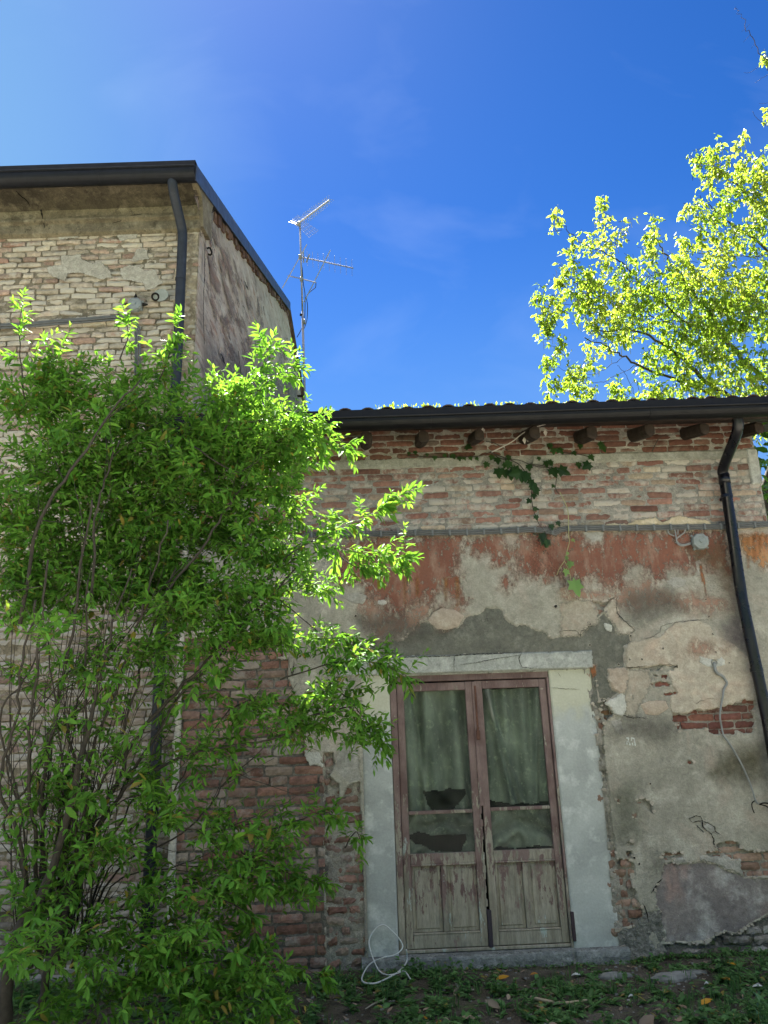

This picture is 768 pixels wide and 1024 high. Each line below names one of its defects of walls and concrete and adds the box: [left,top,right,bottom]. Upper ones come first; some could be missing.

peeling [332,515,768,960]
peeling [304,742,360,785]
crack [689,815,719,845]